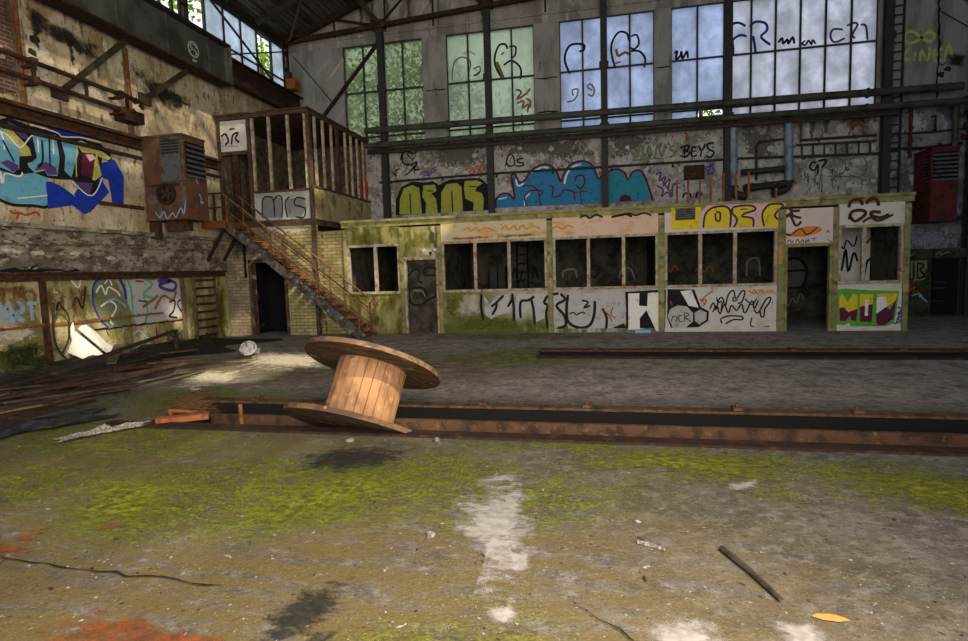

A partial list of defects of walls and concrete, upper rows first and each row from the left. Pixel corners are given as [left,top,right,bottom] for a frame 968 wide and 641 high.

flaking render [0,0,55,102]
leakage [0,341,54,370]
corrosion [53,622,221,641]